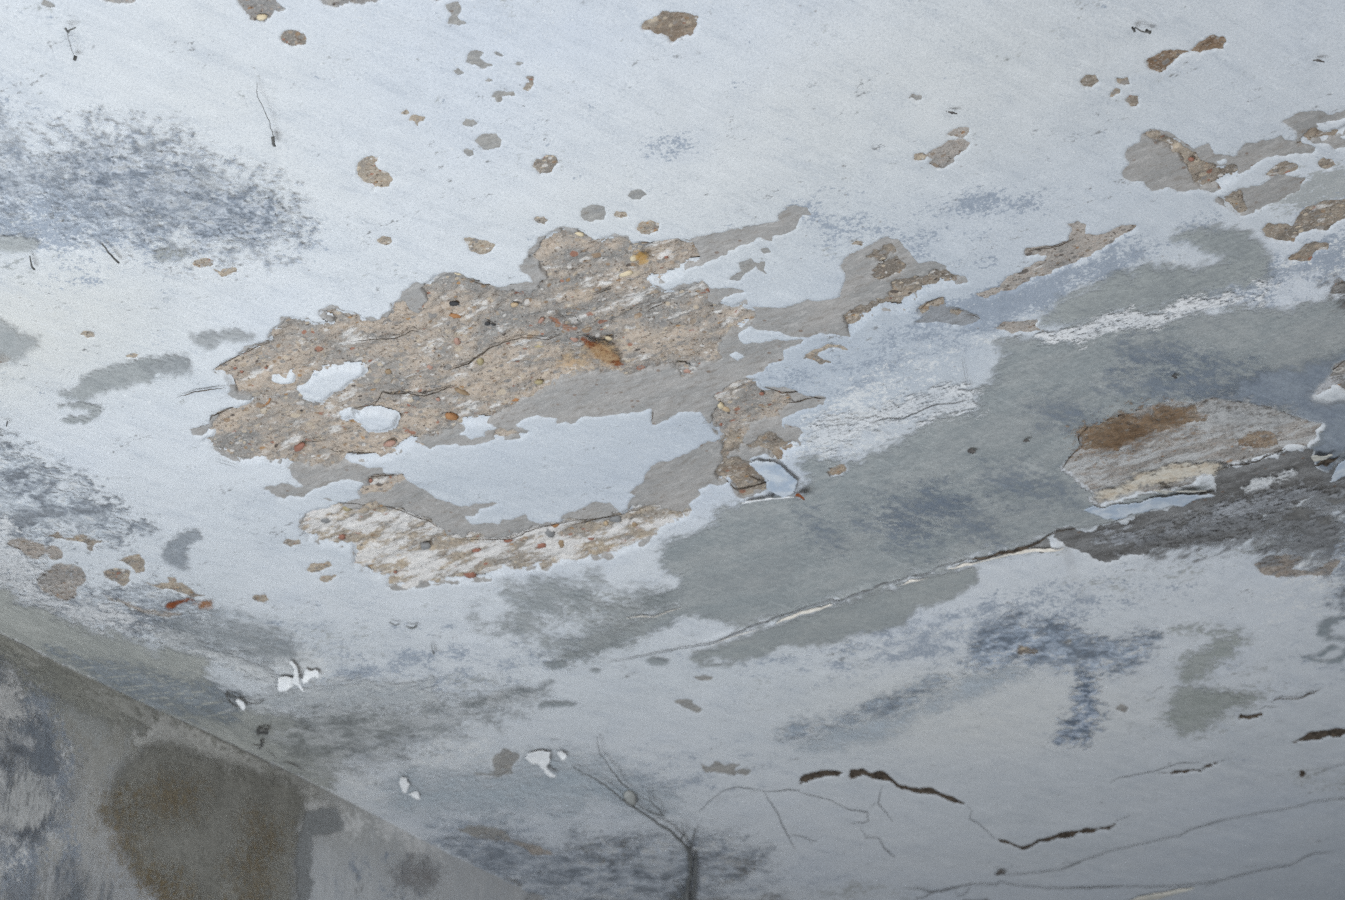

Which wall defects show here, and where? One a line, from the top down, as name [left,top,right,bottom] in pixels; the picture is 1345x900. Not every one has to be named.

spalling [436,0,467,26]
spalling [1110,77,1139,106]
spalling [1146,35,1227,72]
water stain [0,105,320,279]
spalling [1122,110,1345,262]
spalling [190,189,1136,591]
water stain [467,225,1345,673]
spalling [1030,392,1345,578]
water stain [0,433,778,900]
water stain [775,603,1266,752]
crack [1203,689,1321,720]
crack [699,728,1345,900]